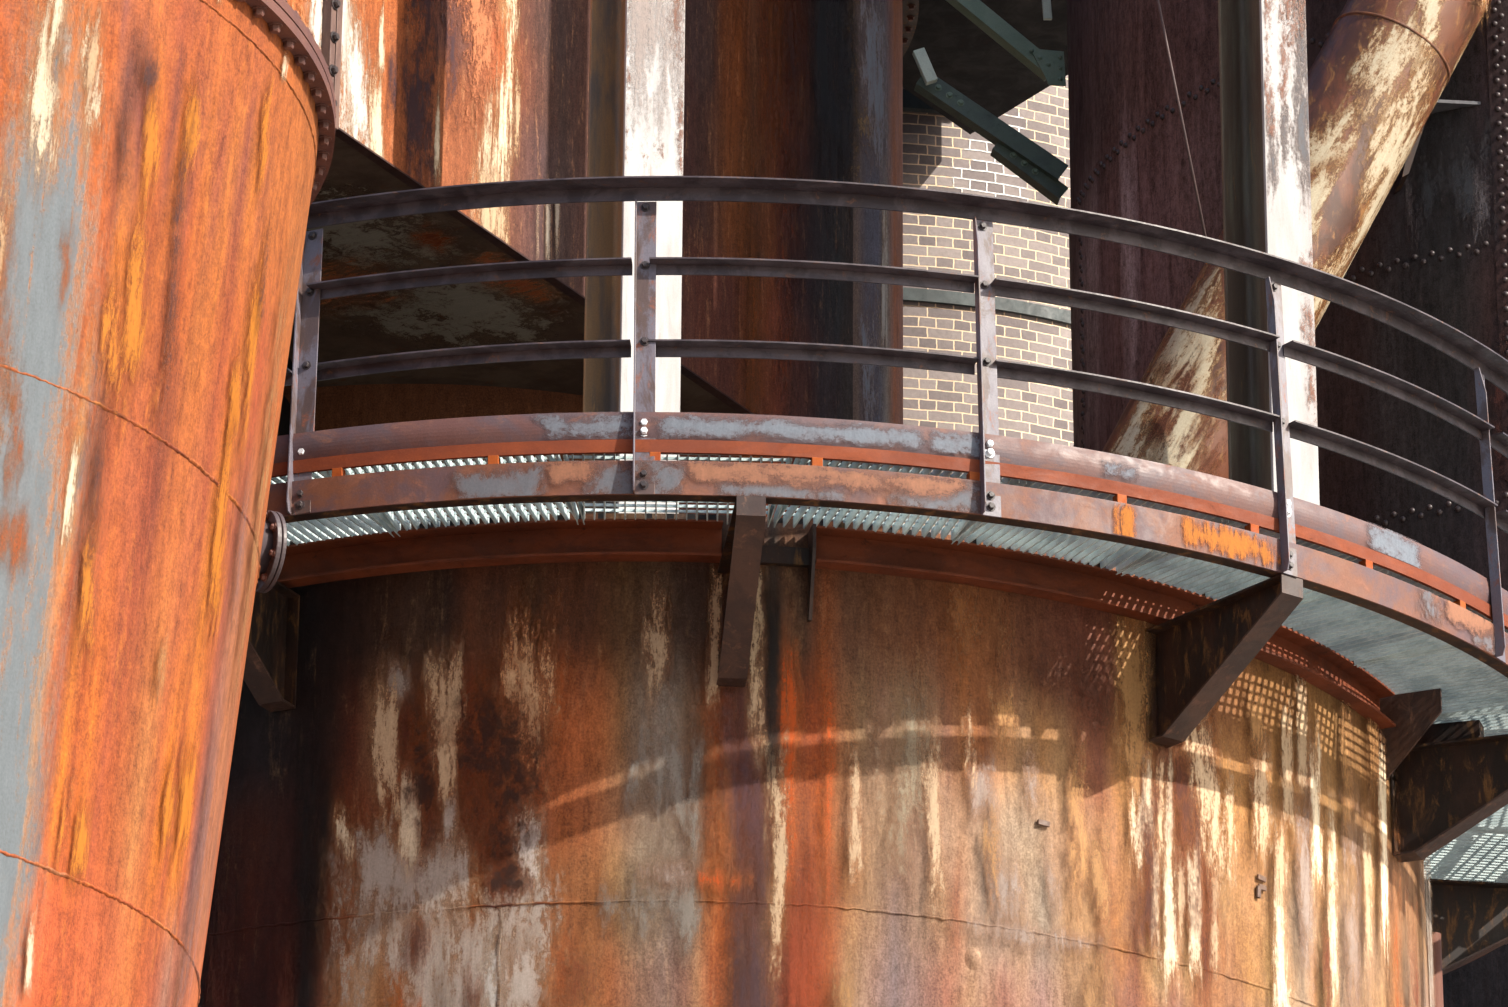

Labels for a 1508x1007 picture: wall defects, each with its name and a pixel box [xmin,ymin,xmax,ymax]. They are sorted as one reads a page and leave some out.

corrosion [99,42,161,404]
corrosion [209,229,272,641]
corrosion [388,0,501,183]
corrosion [625,0,685,175]
peeling [1102,266,1227,481]
corrosion [1147,408,1225,477]
peeling [1314,296,1330,329]
peeling [1266,0,1487,278]
peeling [329,651,562,1007]
peeling [499,623,560,792]
corrosion [778,642,838,1007]
corrosion [1137,725,1216,983]